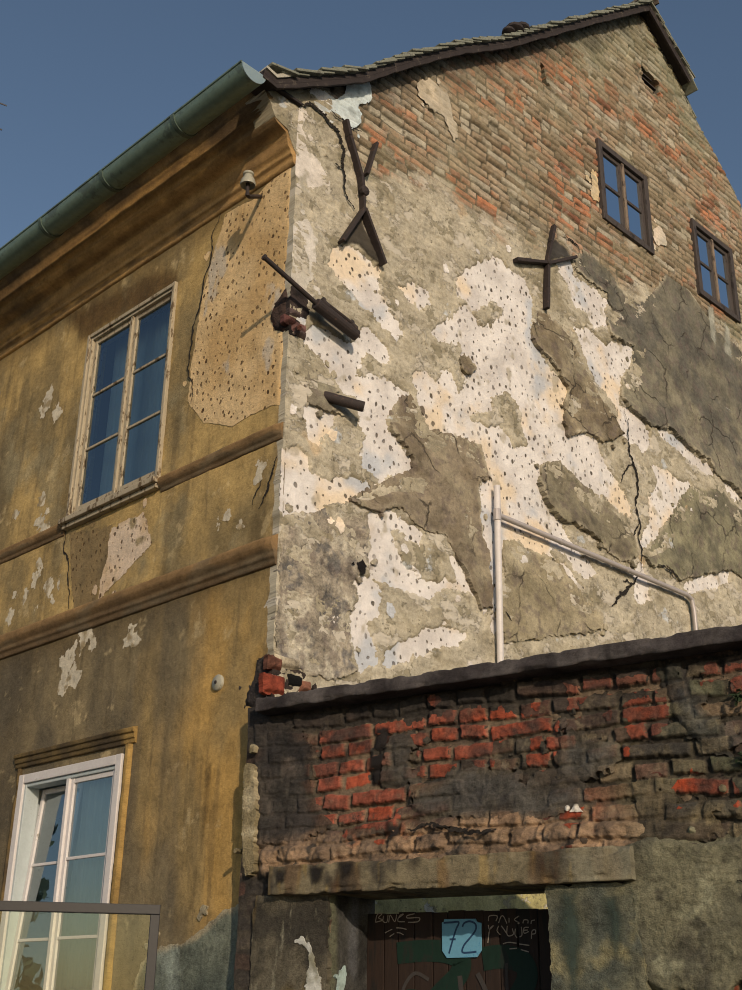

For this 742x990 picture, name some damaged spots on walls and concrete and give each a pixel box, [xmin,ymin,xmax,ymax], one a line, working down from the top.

crack [289,99,362,209]
flaking render [183,168,742,715]
crack [612,411,682,607]
peeling [57,628,97,697]
peeling [123,623,141,648]
spalling [313,669,669,849]
spalling [671,768,742,838]
peeling [294,936,322,990]
peeling [333,965,347,990]